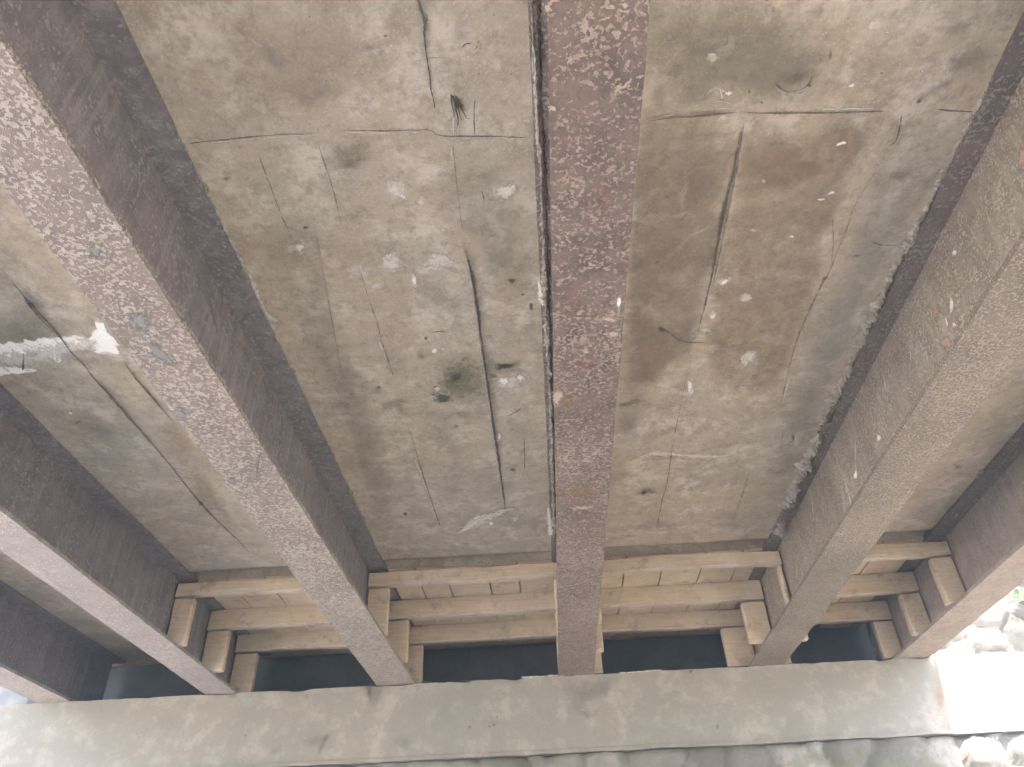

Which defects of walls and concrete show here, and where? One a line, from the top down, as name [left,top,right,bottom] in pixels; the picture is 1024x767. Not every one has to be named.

crack [417,0,448,108]
crack [359,265,393,374]
crack [9,279,239,541]